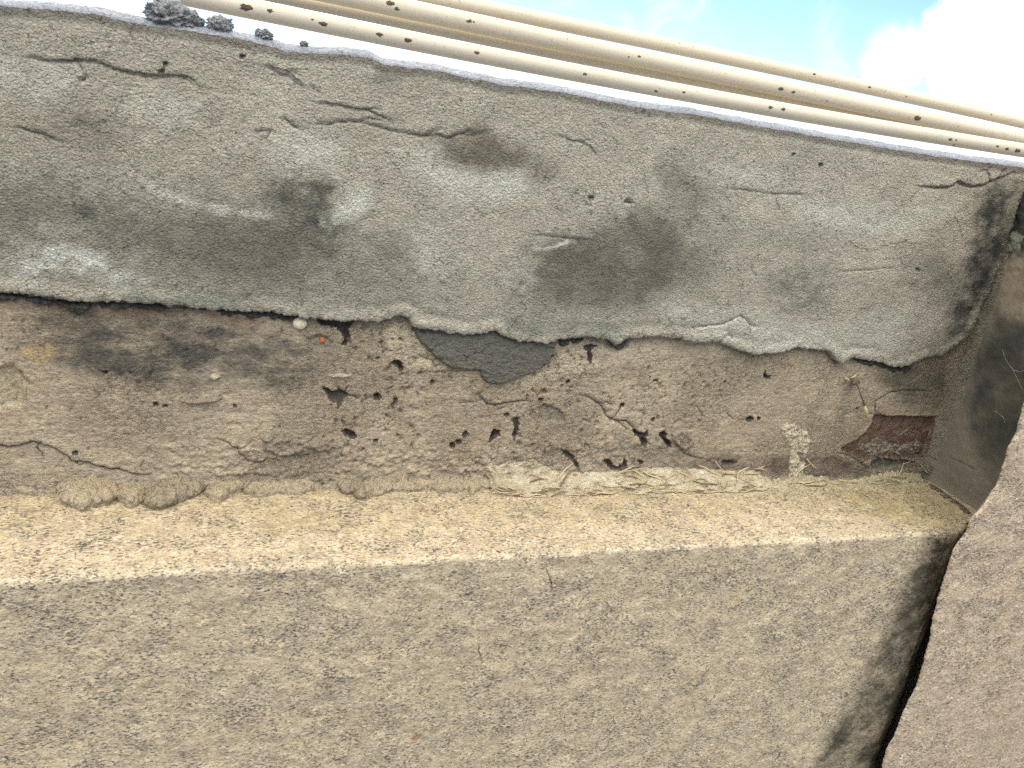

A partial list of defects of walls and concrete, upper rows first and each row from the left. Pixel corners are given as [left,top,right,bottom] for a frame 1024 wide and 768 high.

crack [37,56,195,81]
crack [327,102,479,138]
crack [924,169,1012,188]
leakage [0,43,1024,496]
spalling [0,362,29,412]
peeling [263,435,339,457]
spalling [841,414,937,472]